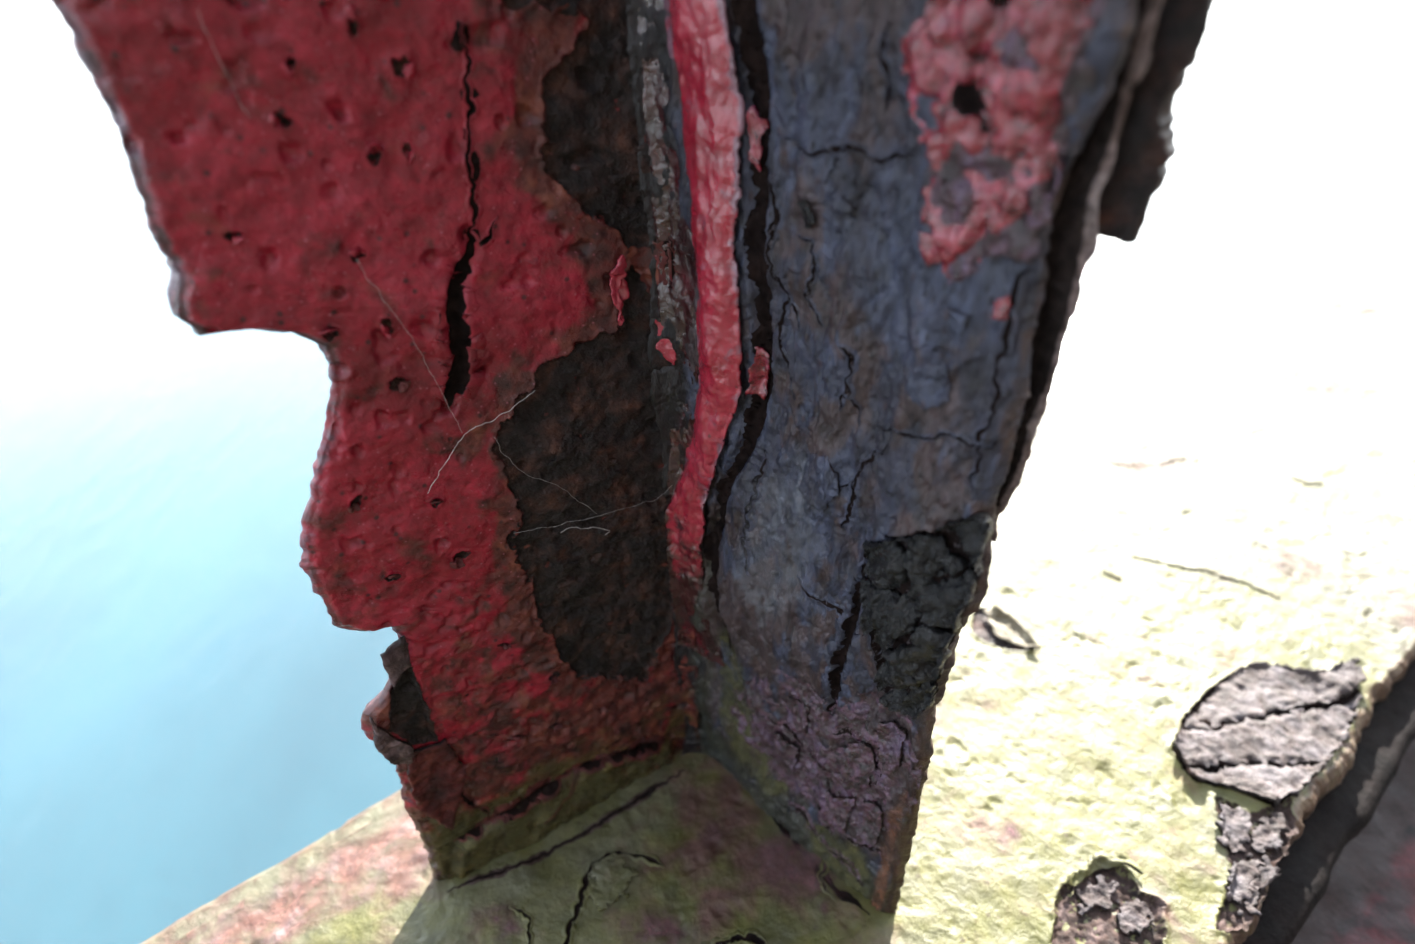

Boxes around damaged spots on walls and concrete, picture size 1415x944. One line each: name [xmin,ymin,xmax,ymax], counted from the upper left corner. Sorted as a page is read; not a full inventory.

crack [427,20,499,407]
crack [702,0,1035,722]
peeling [730,0,1216,847]
spalling [369,635,466,830]
crack [446,734,688,944]
crack [701,928,767,944]
crack [771,798,870,915]
peeling [1174,657,1367,932]